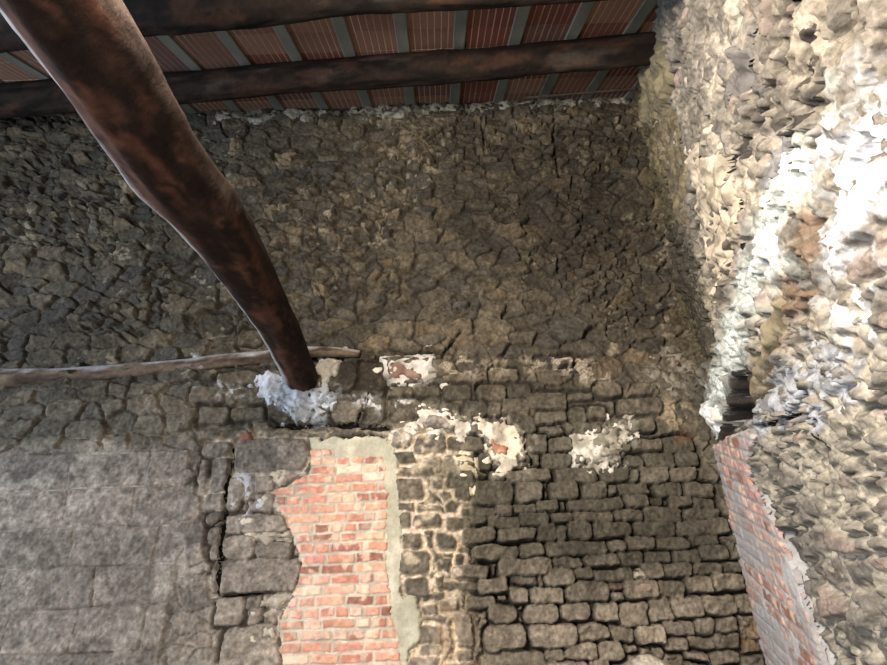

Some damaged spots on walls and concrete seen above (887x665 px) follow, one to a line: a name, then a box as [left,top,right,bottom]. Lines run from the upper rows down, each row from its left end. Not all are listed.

flaking render [373,362,422,379]
leakage [658,108,887,440]